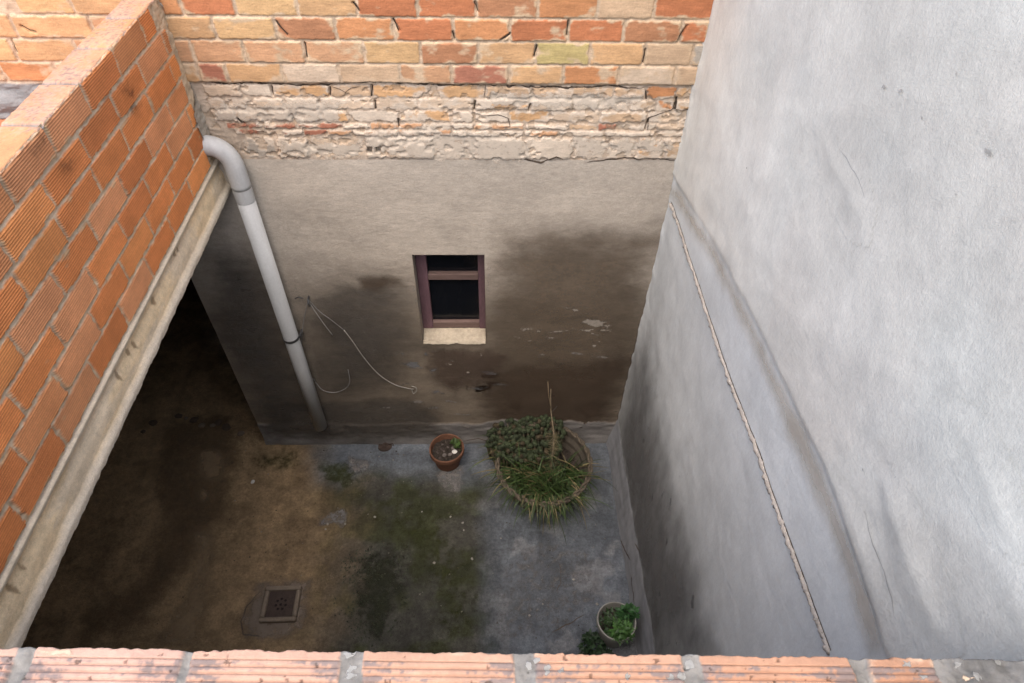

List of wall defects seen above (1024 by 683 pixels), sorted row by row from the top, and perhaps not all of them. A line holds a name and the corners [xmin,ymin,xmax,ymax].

peeling [490,91,643,110]
crack [647,98,688,130]
peeling [281,125,532,163]
damp [322,235,658,422]
peeling [517,308,611,347]
damp [222,262,437,439]
crack [671,202,831,651]